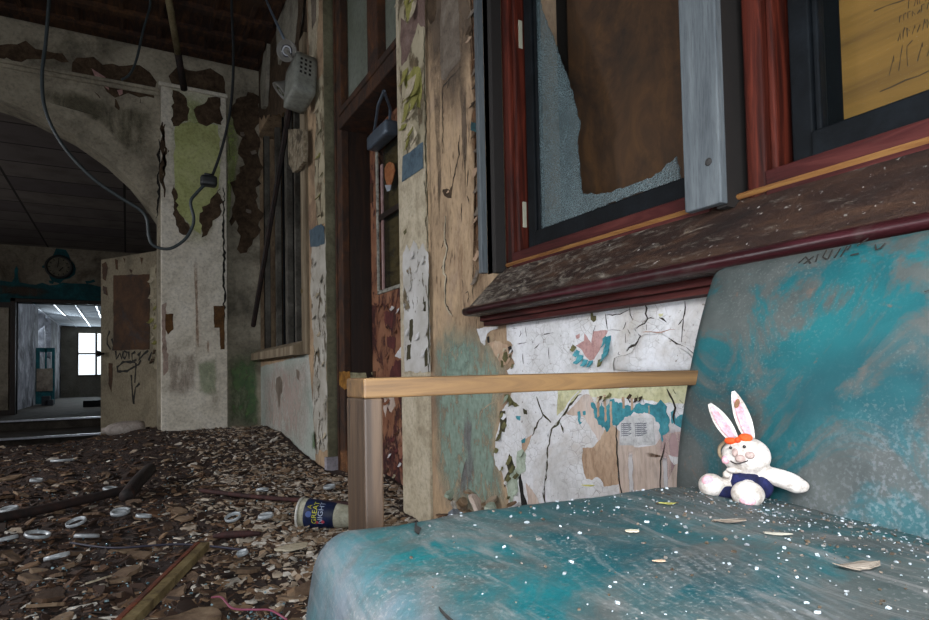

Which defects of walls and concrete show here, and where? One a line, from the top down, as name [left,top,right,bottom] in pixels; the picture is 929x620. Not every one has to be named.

crack [156,122,169,218]
flaking render [171,0,319,254]
peeling [138,74,349,620]
peeling [376,229,431,377]
peeling [477,297,707,374]
crack [592,304,693,357]
peeling [383,398,396,417]
crack [478,391,582,505]
peeling [494,386,687,508]
crack [614,426,622,493]
crack [659,444,667,488]
crack [667,389,684,424]